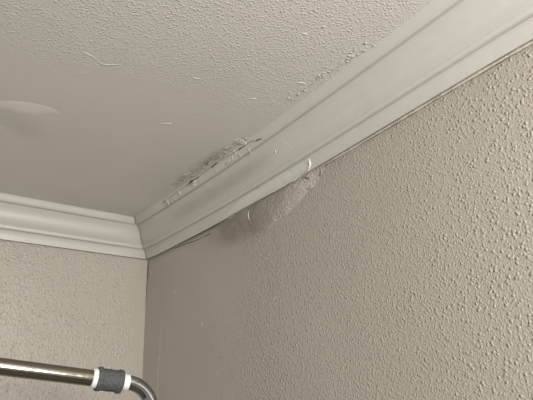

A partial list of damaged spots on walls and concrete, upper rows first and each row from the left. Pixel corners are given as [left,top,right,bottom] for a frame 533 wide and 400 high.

peeling [163,135,261,207]